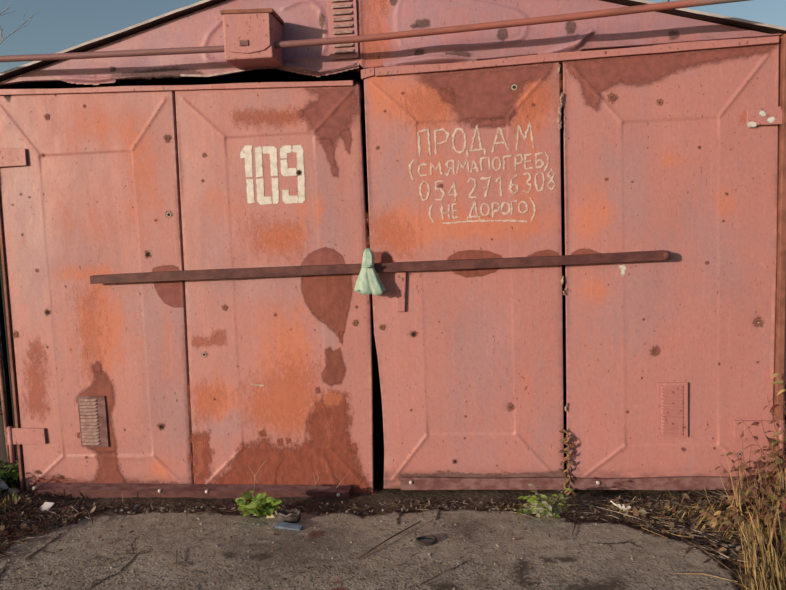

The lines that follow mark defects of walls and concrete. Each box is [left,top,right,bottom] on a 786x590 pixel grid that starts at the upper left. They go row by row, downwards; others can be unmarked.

rust [421,62,554,128]
rust [565,44,777,111]
rust [298,86,358,176]
rust [152,265,183,307]
rust [447,250,502,278]
rust [188,247,373,495]
rust [77,361,125,484]
crack [87,538,152,590]